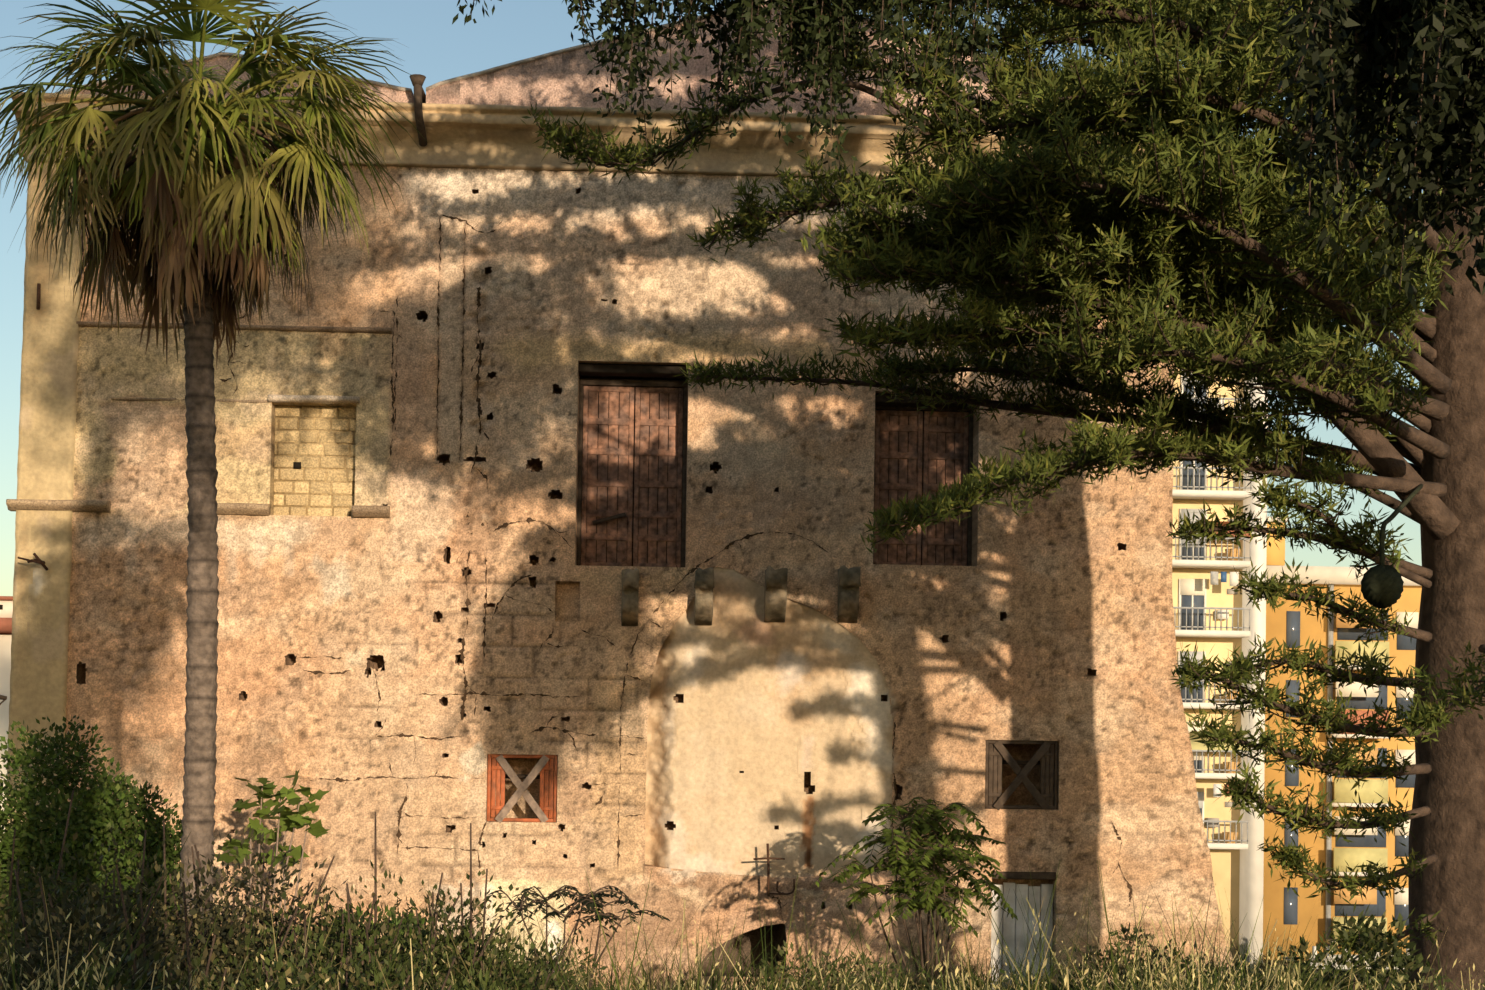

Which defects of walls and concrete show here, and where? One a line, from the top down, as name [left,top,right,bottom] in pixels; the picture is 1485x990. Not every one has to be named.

crack [299,212,827,869]
corrosion [799,794,819,873]